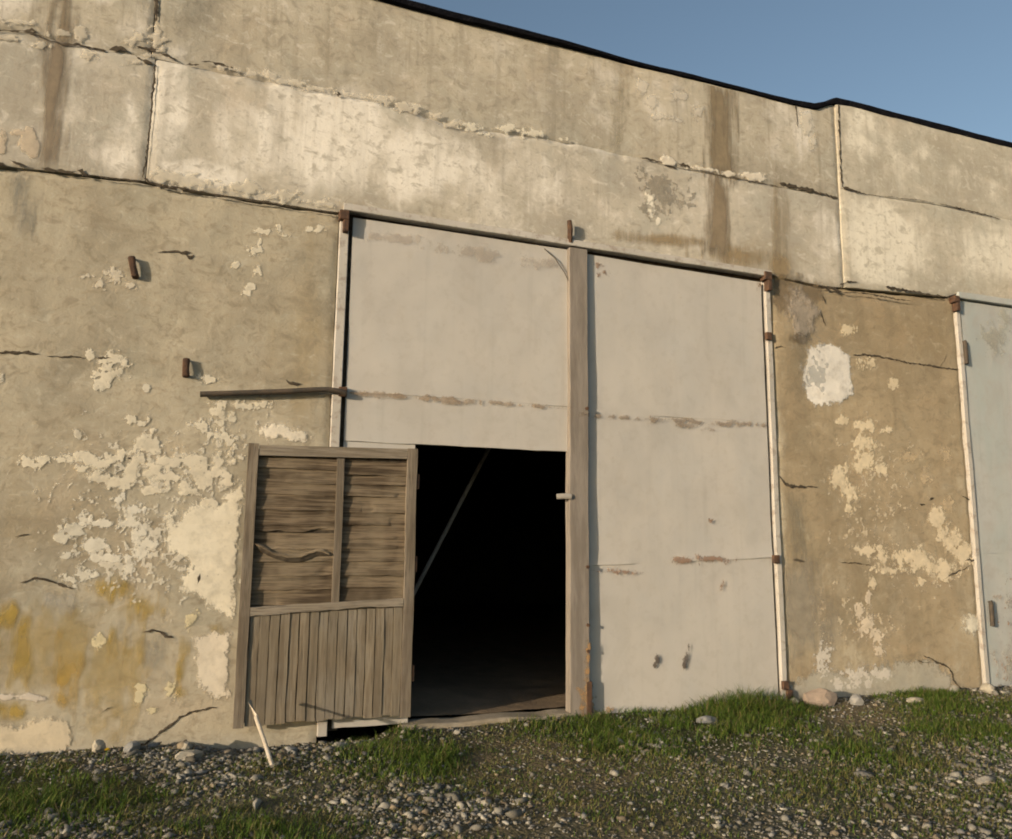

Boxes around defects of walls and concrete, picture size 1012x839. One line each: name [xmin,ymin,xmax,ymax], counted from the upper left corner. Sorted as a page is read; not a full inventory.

damp [42,0,73,162]
crack [0,28,233,178]
spalling [660,154,768,183]
damp [708,85,760,264]
damp [772,256,820,311]
crack [0,350,110,359]
peeling [85,348,133,392]
peeling [803,324,974,707]
crack [21,577,76,589]
peeling [16,399,307,700]
corrosion [672,554,737,566]
crack [141,707,216,745]